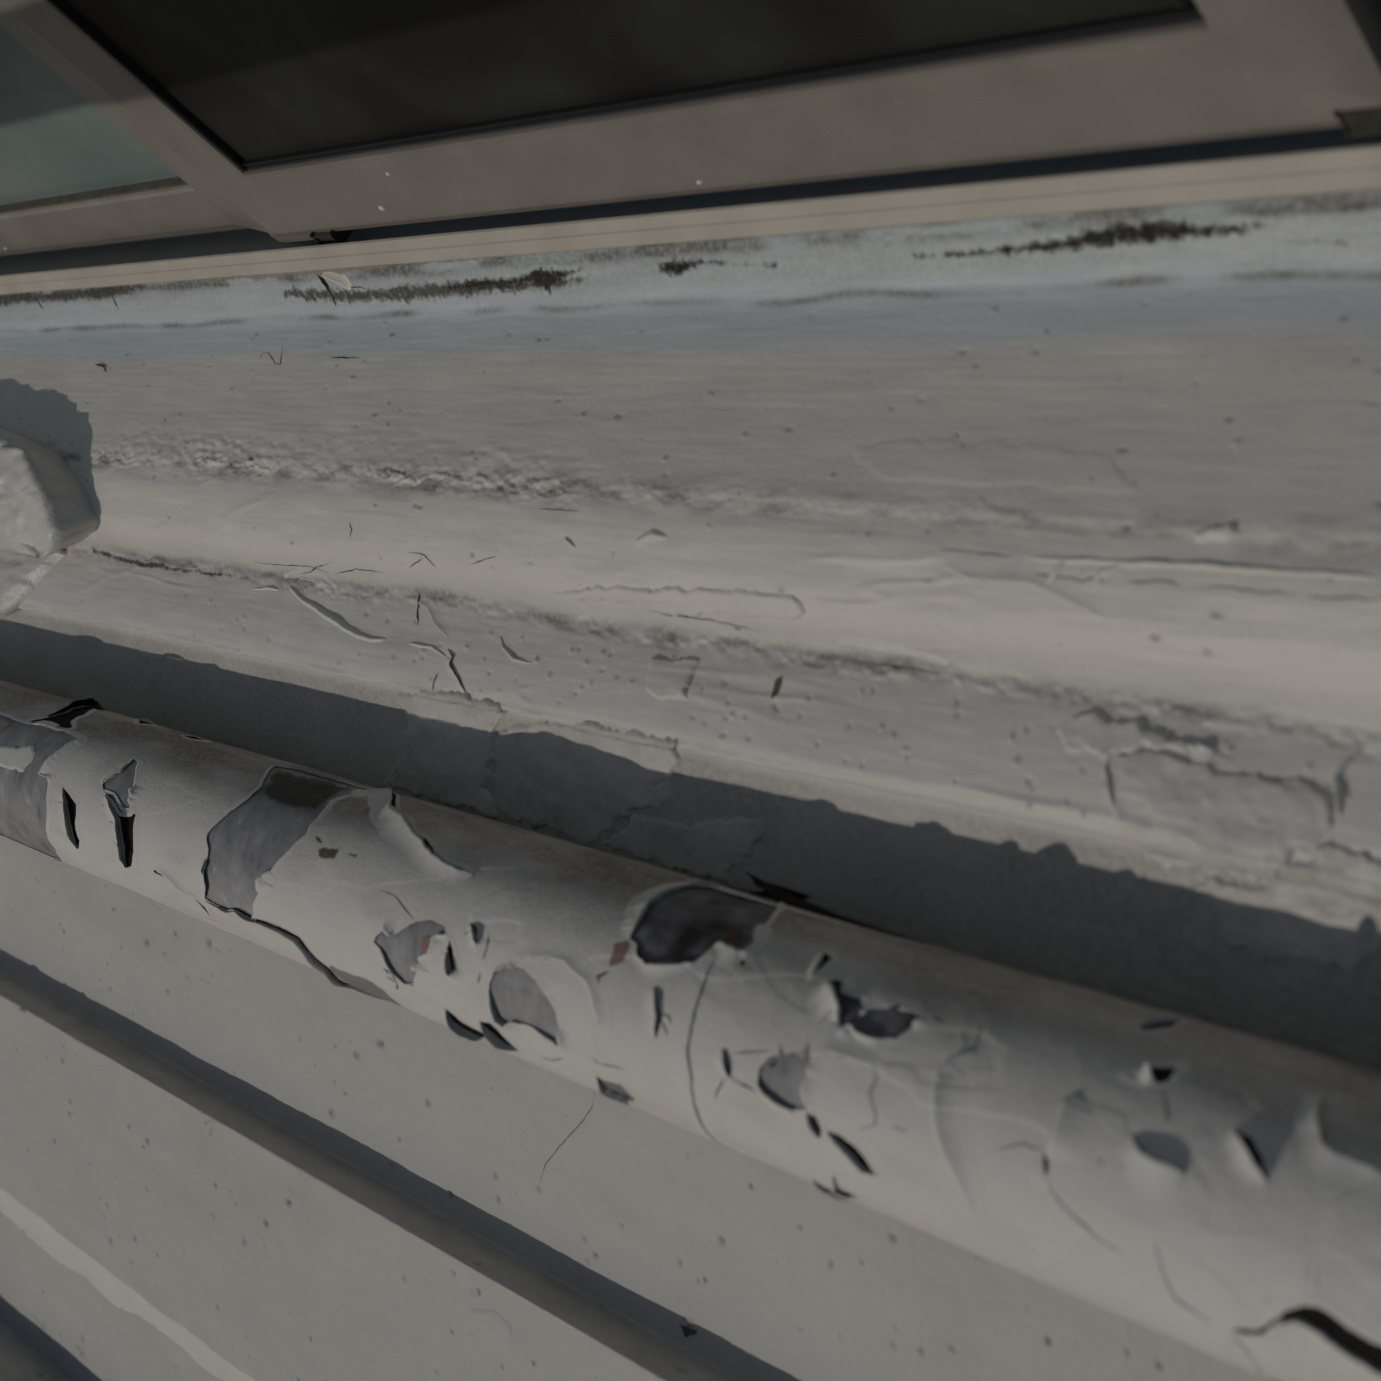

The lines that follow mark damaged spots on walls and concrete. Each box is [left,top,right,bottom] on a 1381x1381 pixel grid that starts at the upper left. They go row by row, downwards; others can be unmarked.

water stain [945,221,1259,258]
water stain [284,268,579,304]
peeling [0,711,88,864]
peeling [100,756,145,817]
crack [1190,740,1234,763]
peeling [196,765,475,923]
peeling [372,914,451,988]
peeling [485,956,576,1059]
peeling [753,976,932,1119]
peeling [1119,1058,1189,1090]